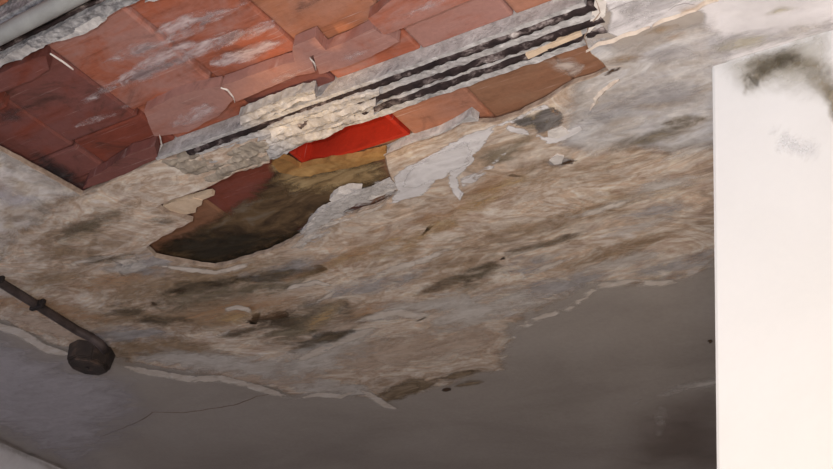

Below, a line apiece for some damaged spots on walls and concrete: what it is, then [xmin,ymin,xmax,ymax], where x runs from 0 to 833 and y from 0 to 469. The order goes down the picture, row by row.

water stain [718,33,786,51]
water stain [737,42,833,116]
water stain [403,143,471,188]
water stain [460,141,523,193]
peeling [0,0,726,410]
peeling [0,348,126,458]
water stain [378,370,480,401]